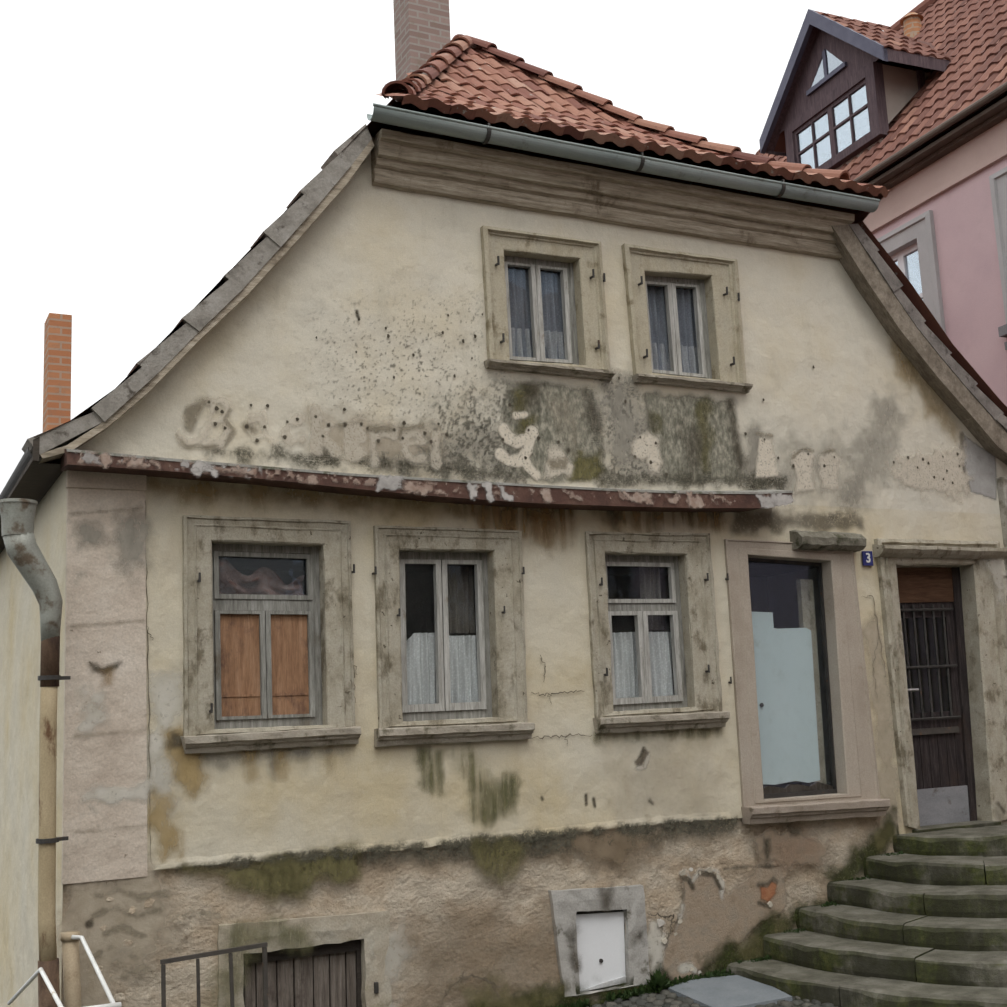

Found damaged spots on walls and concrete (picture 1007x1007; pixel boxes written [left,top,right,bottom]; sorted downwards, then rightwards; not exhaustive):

peeling [78,452,160,469]
mould [270,445,340,469]
peeling [181,461,515,502]
water stain [357,388,526,484]
water stain [590,378,787,490]
crack [532,655,585,704]
water stain [166,728,215,795]
crack [532,734,592,746]
spalling [635,747,649,770]
water stain [83,781,178,858]
mould [205,817,738,868]
peeling [647,825,831,980]